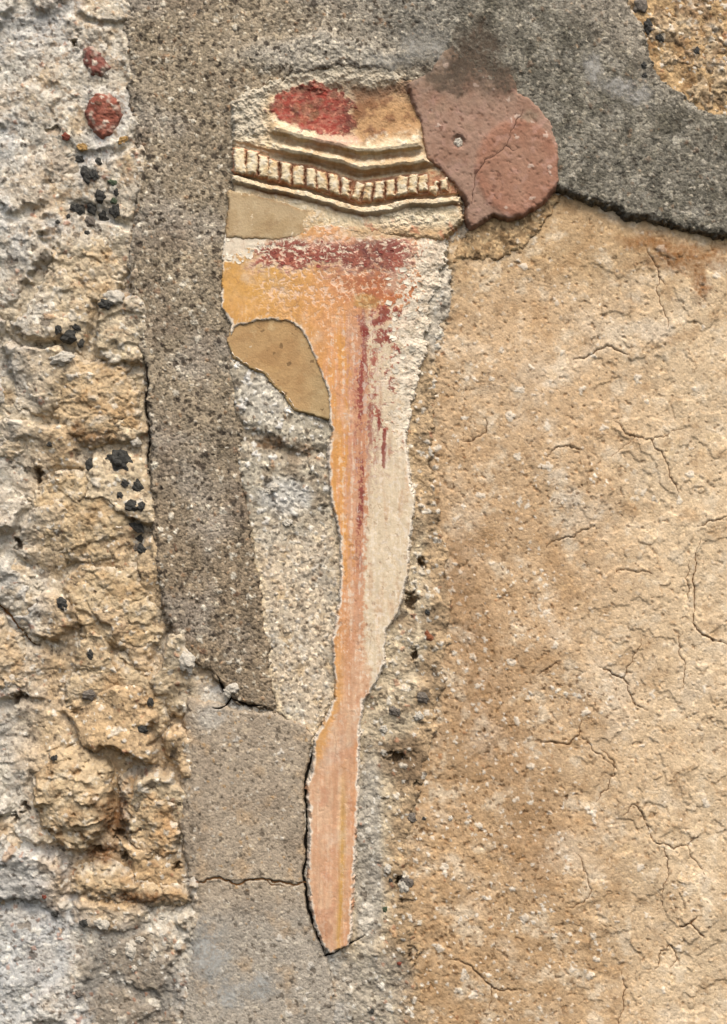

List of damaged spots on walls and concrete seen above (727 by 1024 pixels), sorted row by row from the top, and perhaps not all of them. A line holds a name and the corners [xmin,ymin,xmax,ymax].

spalling [225,189,331,265]
peeling [386,267,425,378]
crack [645,246,669,326]
crack [613,421,679,497]
spalling [227,319,341,747]
crack [678,516,727,686]
crack [598,639,644,708]
crack [538,721,617,800]
crack [186,747,362,956]
crack [624,804,705,909]
crack [653,917,704,972]
crack [453,959,522,1017]